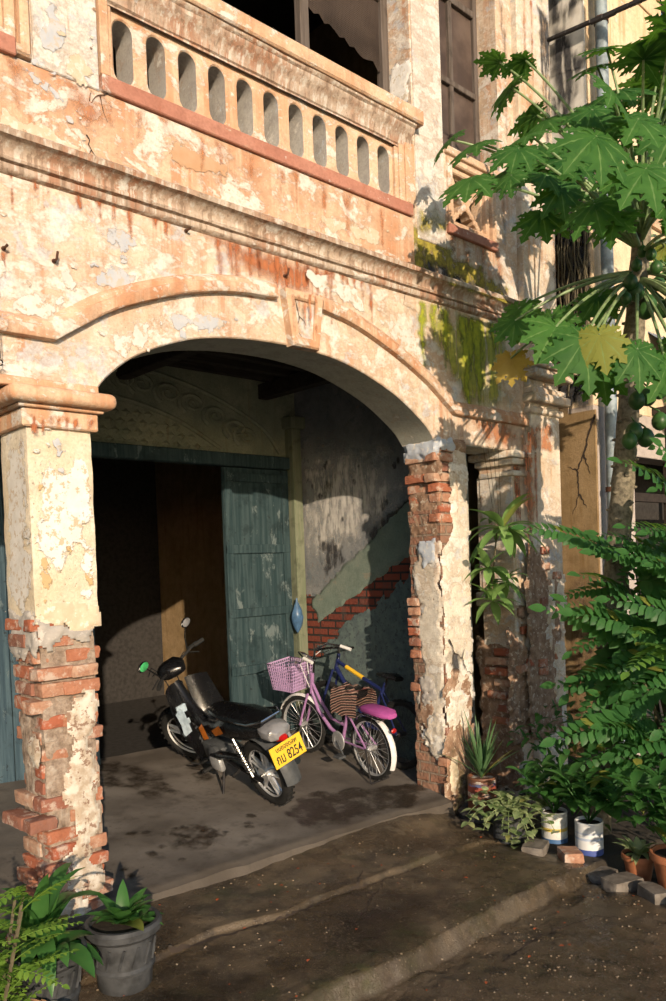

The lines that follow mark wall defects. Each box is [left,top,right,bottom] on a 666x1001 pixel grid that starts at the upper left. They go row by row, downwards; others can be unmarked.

peeling [0,107,96,156]
peeling [22,53,101,124]
damp [538,0,586,128]
peeling [13,263,77,319]
peeling [98,312,238,358]
damp [418,302,497,404]
damp [554,225,591,329]
damp [559,374,592,407]
crack [570,414,596,511]
spalling [2,428,114,919]
spalling [306,435,568,816]
damp [286,784,425,826]